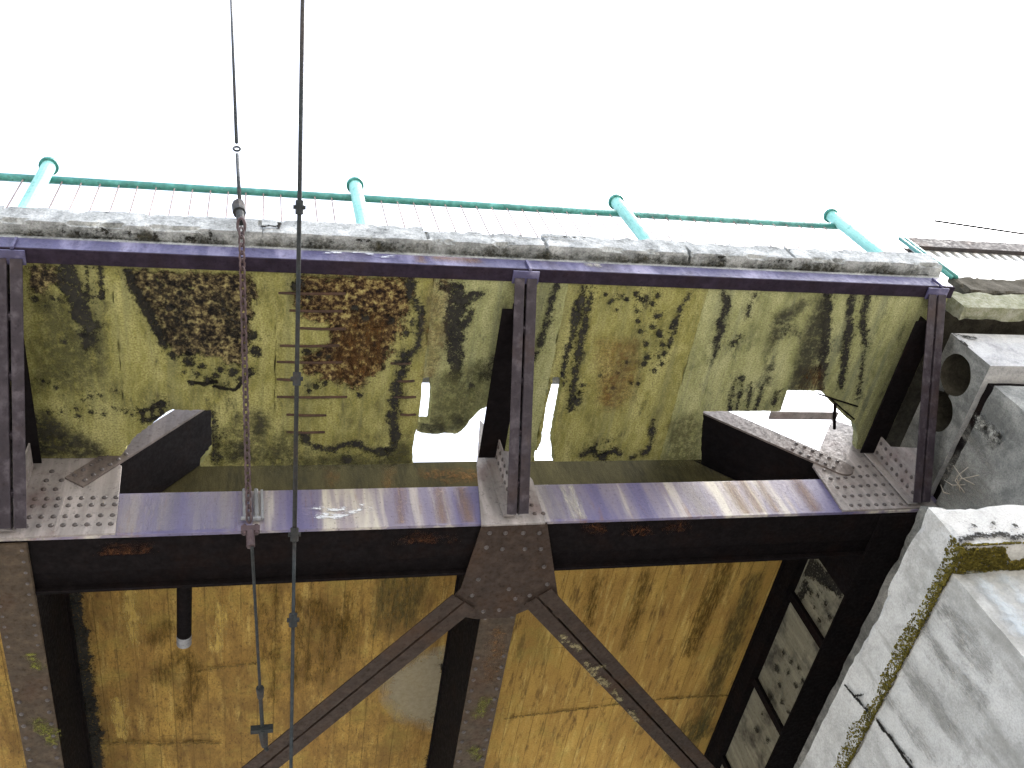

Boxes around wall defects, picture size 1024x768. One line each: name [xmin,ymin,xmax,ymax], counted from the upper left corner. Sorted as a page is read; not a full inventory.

leakage [150,275,211,356]
leakage [534,283,561,361]
leakage [557,285,598,414]
leakage [655,292,690,367]
leakage [707,289,745,363]
leakage [726,293,871,412]
crack [844,684,913,768]